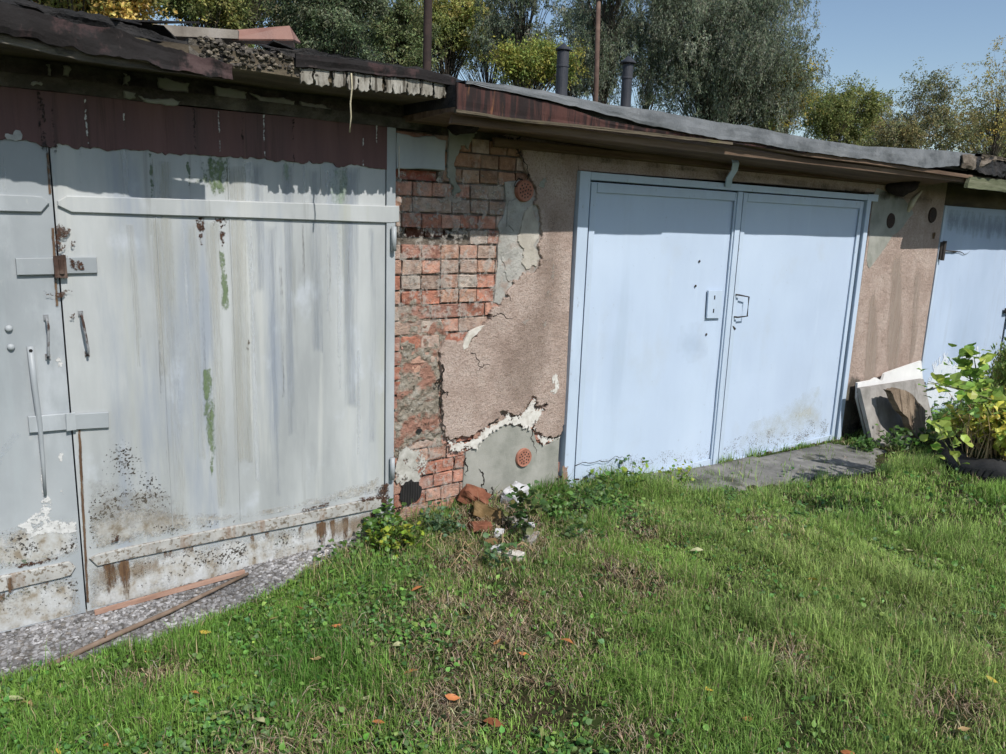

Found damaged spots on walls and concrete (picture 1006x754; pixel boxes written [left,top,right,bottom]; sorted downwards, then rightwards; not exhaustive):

peeling [183,35,446,99]
rust [52,224,85,270]
peeling [492,180,541,305]
peeling [463,325,485,350]
crack [435,364,448,429]
crack [465,458,502,500]
water stain [0,475,77,568]
rust [78,429,89,603]
rust [316,483,390,544]
rust [104,547,193,592]
water stain [90,512,376,608]
water stain [0,575,79,632]